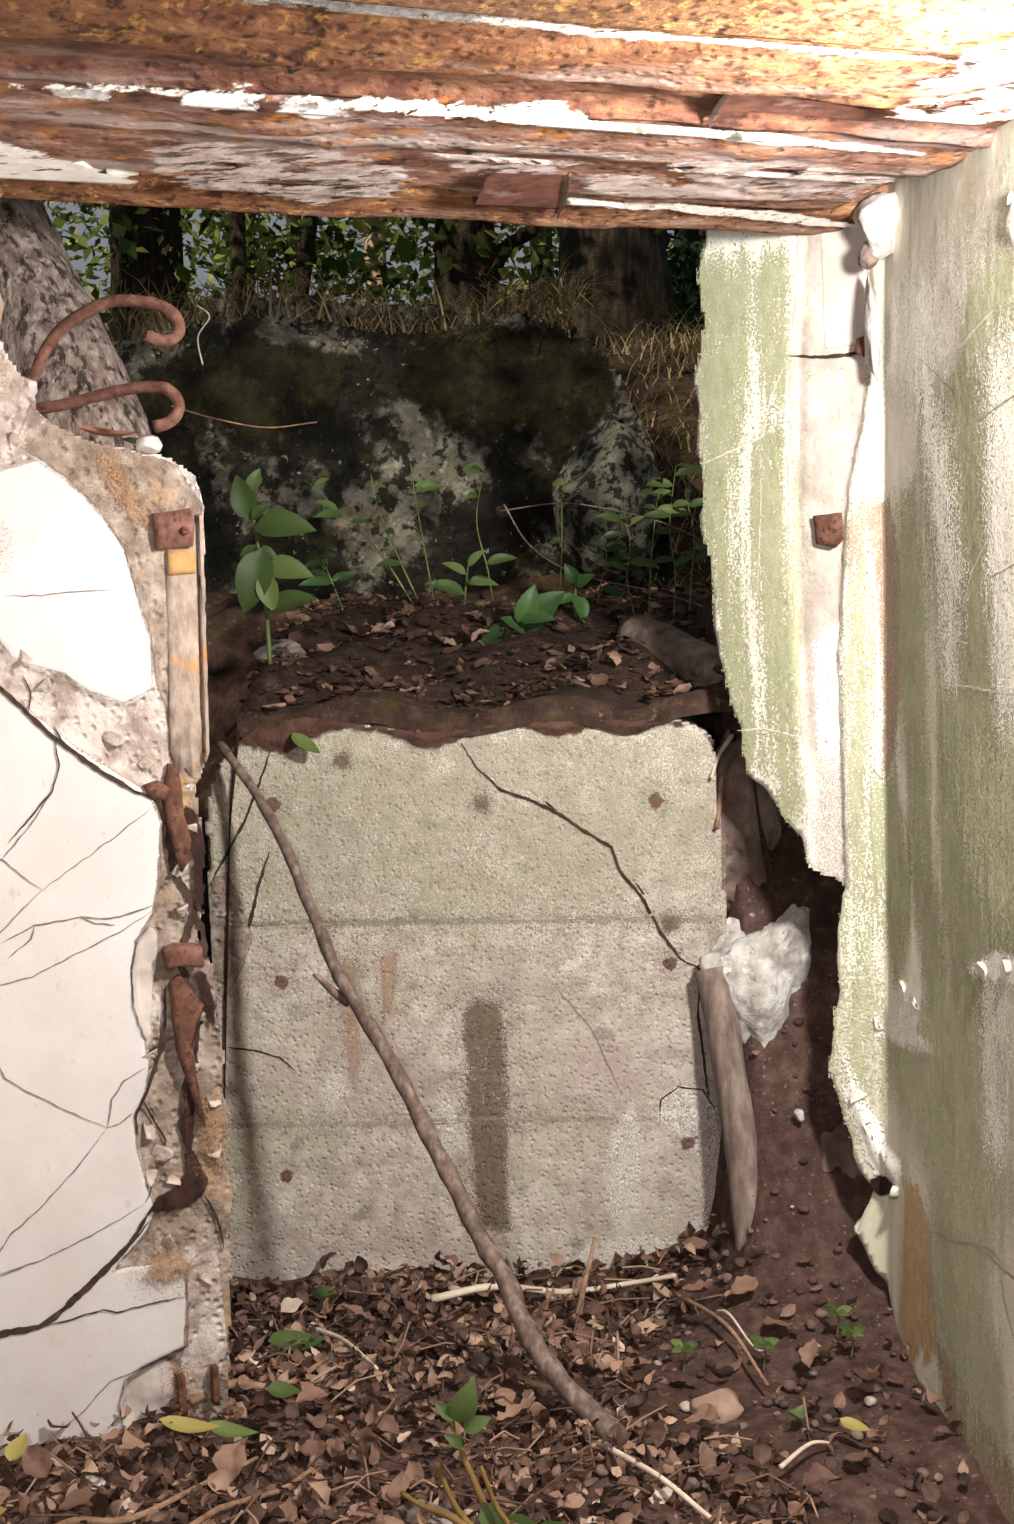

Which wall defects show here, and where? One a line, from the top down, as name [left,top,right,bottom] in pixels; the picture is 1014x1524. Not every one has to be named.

peeling [50,88,112,102]
peeling [179,83,350,119]
peeling [934,92,967,110]
peeling [0,141,418,206]
peeling [424,151,894,198]
damp [731,232,829,830]
damp [828,138,1014,1204]
crack [0,676,295,1338]
crack [461,743,716,1218]
corrosion [198,1085,229,1176]
damp [416,996,514,1235]
corrosion [144,1246,194,1288]